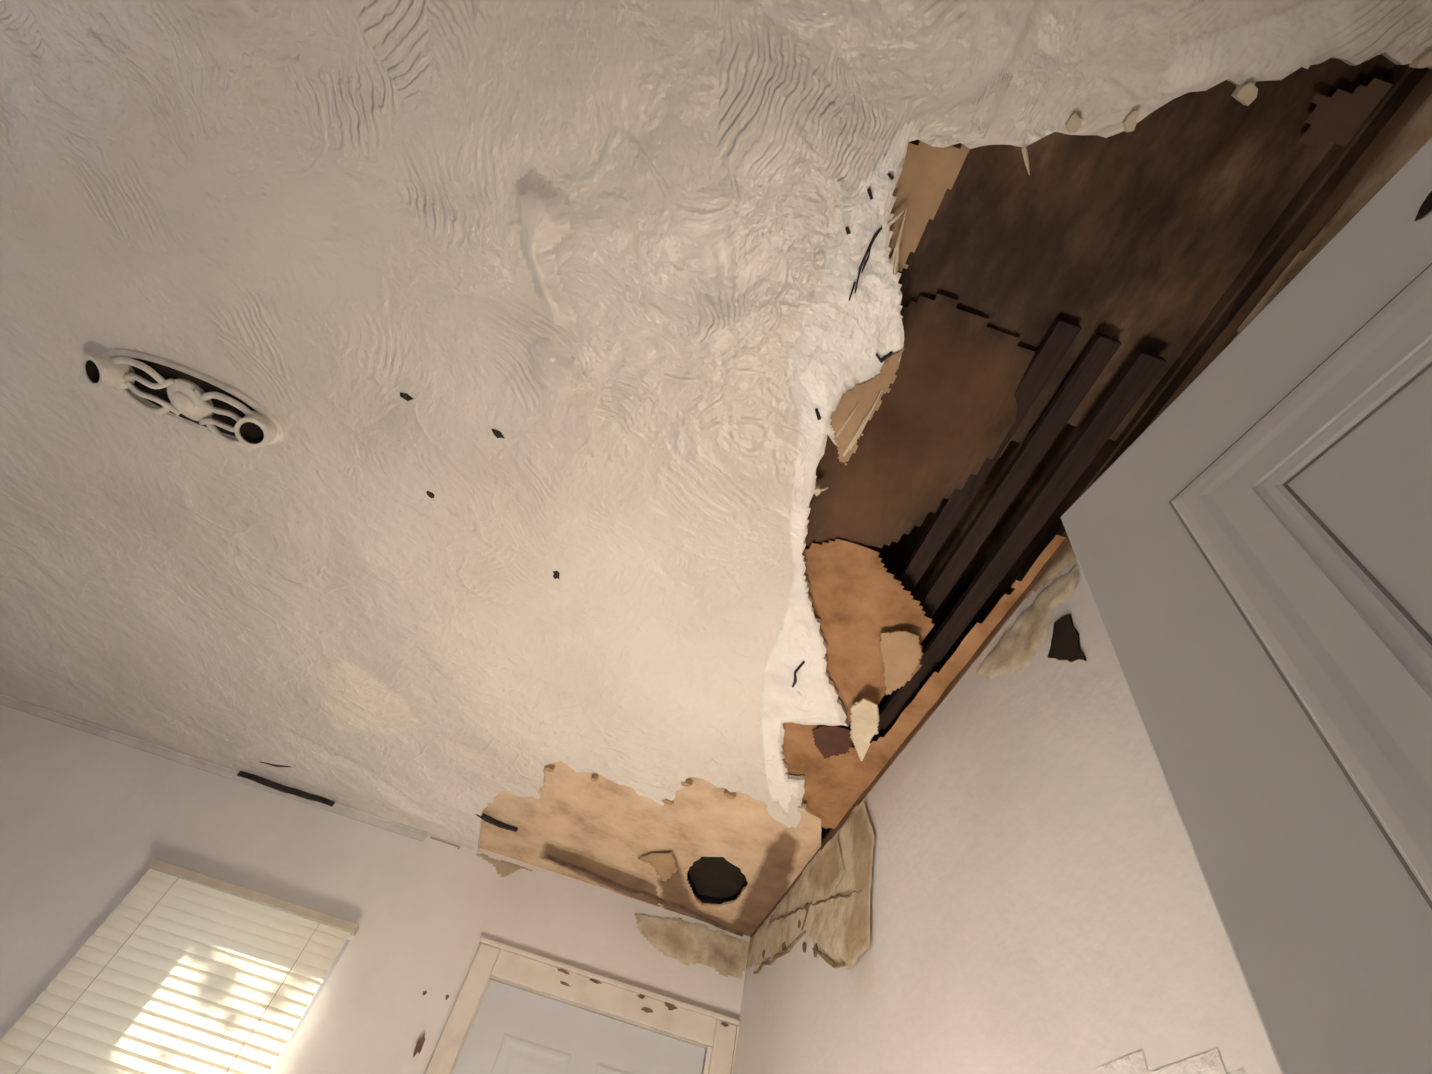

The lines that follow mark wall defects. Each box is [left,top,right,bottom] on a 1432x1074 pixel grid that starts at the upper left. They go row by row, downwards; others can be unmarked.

flaking render [1304,94,1432,251]
water stain [1232,195,1363,341]
flaking render [476,114,924,979]
flaking render [976,543,1087,681]
peeling [213,726,460,850]